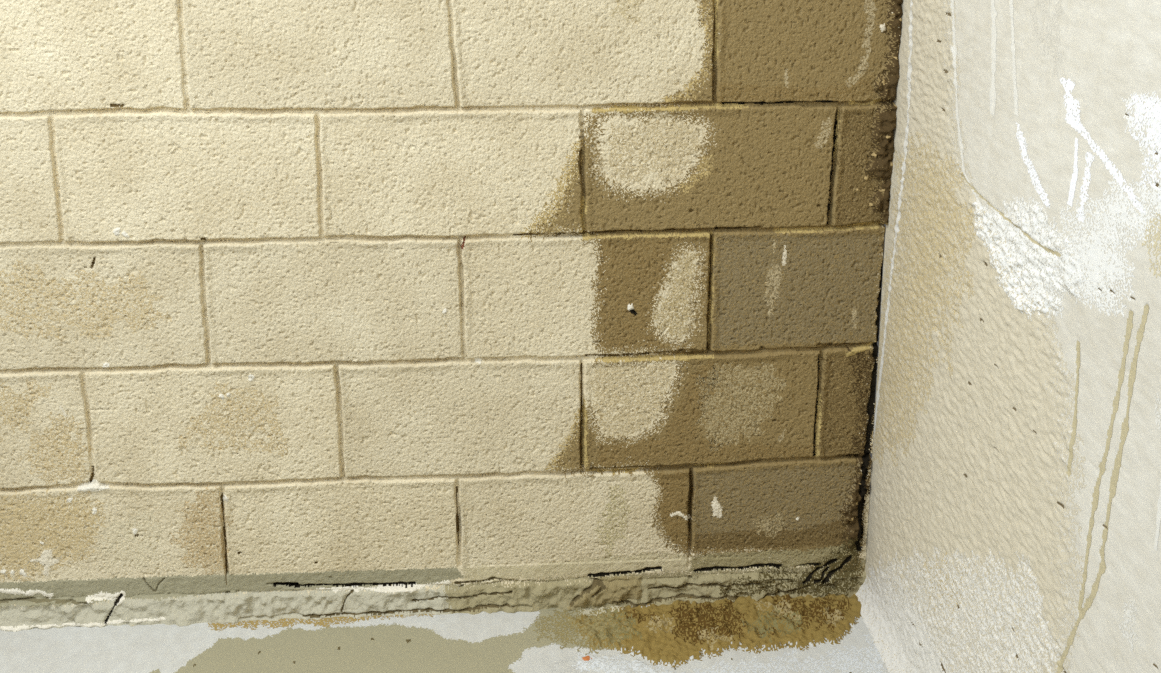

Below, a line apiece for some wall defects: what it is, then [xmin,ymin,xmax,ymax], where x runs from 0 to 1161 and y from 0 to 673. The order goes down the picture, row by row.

crack [570,226,884,607]
water stain [520,0,1064,673]
water stain [1142,213,1161,278]